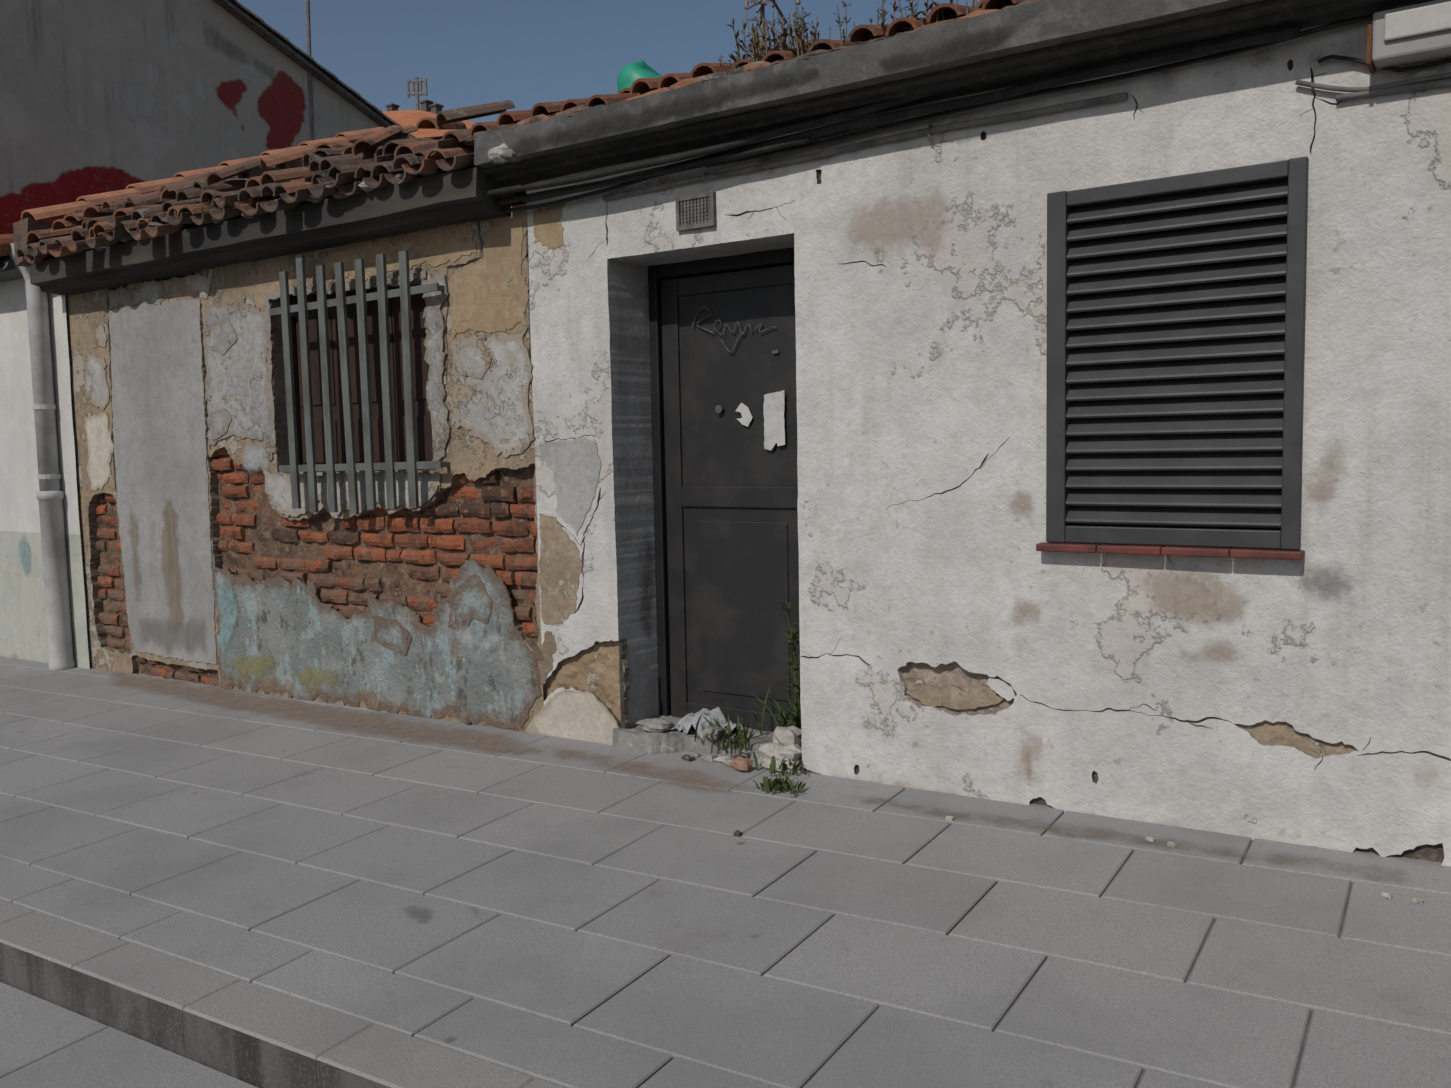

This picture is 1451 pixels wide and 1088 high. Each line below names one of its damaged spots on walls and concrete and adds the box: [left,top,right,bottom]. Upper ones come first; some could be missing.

flaking render [84,279,220,686]
flaking render [185,269,602,656]
crack [886,437,1010,510]
spalling [543,639,630,729]
spalling [898,661,1017,716]
crack [1020,694,1232,729]